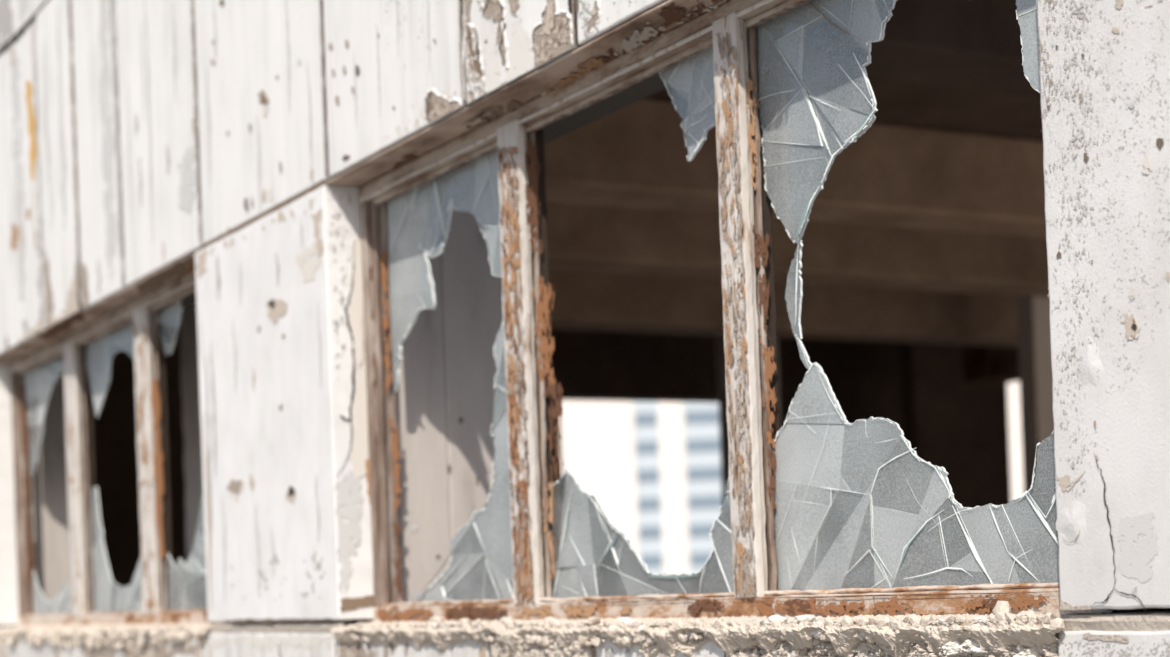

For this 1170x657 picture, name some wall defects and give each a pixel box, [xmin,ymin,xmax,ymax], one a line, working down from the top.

peeling [424,0,522,123]
peeling [531,0,602,66]
corrosion [466,0,730,131]
corrosion [25,81,37,181]
crack [336,242,355,477]
corrosion [369,32,1060,657]
crack [1090,454,1146,612]
spalling [81,638,199,657]
spalling [335,623,610,657]
spalling [631,623,713,657]
spalling [727,616,799,627]
spalling [733,618,1059,657]